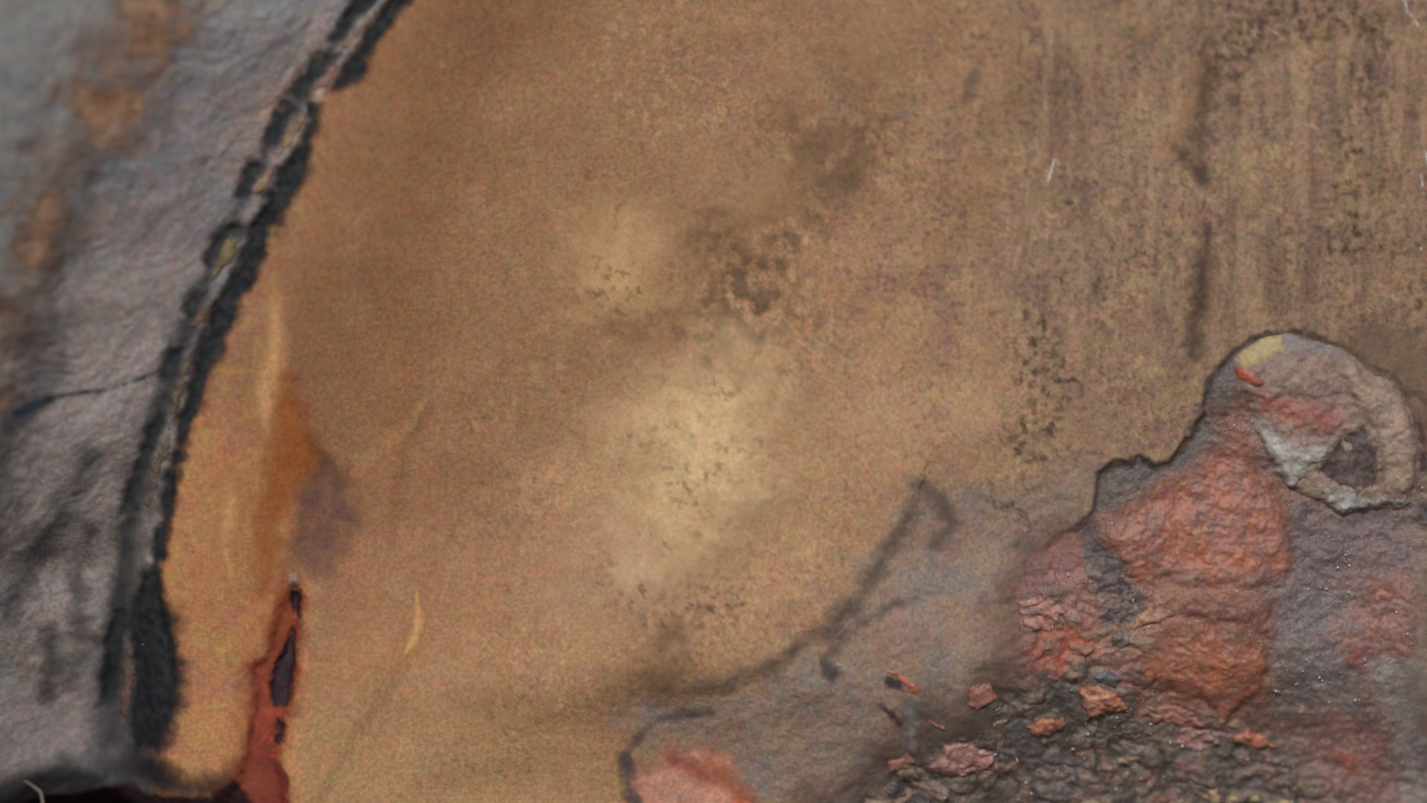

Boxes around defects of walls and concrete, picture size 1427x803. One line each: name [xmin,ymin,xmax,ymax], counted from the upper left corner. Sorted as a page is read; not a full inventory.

corrosion [118,0,195,68]
corrosion [53,65,146,151]
corrosion [11,190,72,272]
spalling [828,329,1427,803]
peeling [395,587,426,666]
corrosion [234,573,304,803]
spalling [821,661,845,680]
spalling [619,731,751,803]